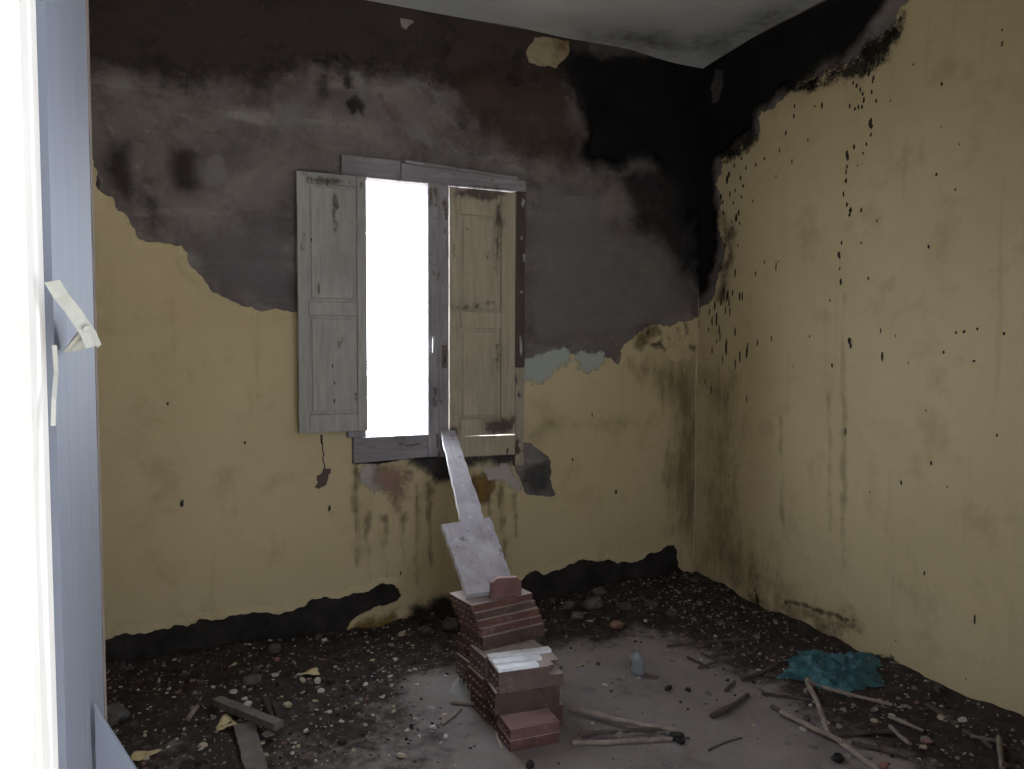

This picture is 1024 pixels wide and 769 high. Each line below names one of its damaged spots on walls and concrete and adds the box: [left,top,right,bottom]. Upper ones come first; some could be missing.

peeling [90,0,912,371]
damp [708,269,758,368]
damp [354,464,411,512]
damp [471,473,503,505]
flaking render [514,442,559,501]
flaking render [518,540,692,600]
flaking render [105,577,407,663]